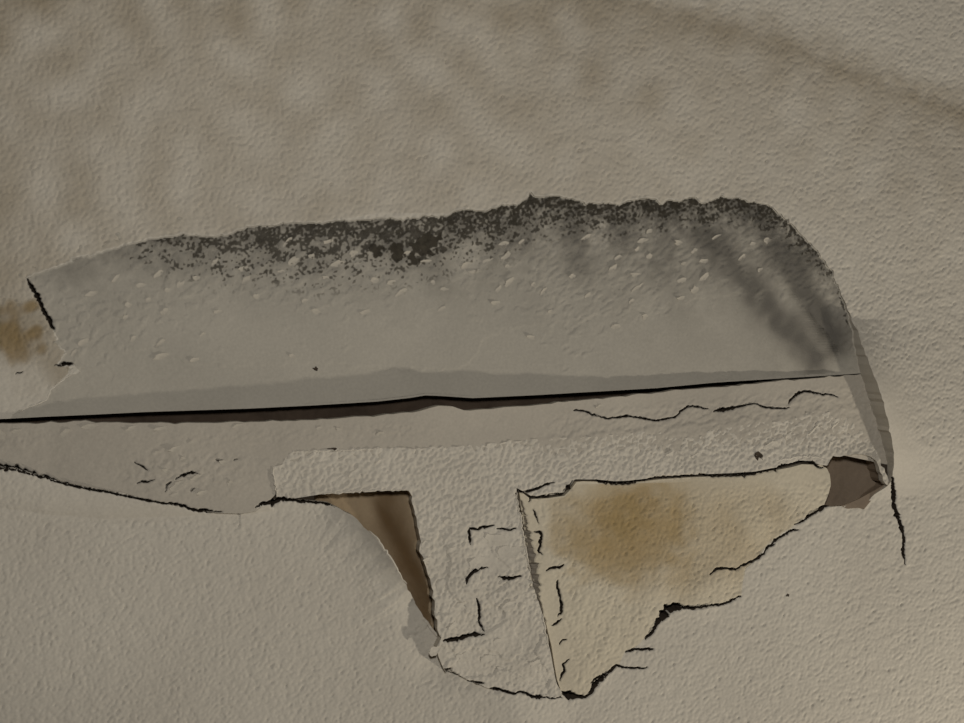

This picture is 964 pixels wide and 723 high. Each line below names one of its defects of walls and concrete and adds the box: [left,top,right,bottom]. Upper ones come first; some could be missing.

crack [27,278,55,330]
crack [0,374,852,423]
peeling [0,192,889,698]
crack [0,459,236,513]
crack [255,497,334,508]
crack [891,477,906,565]
crack [443,461,828,700]